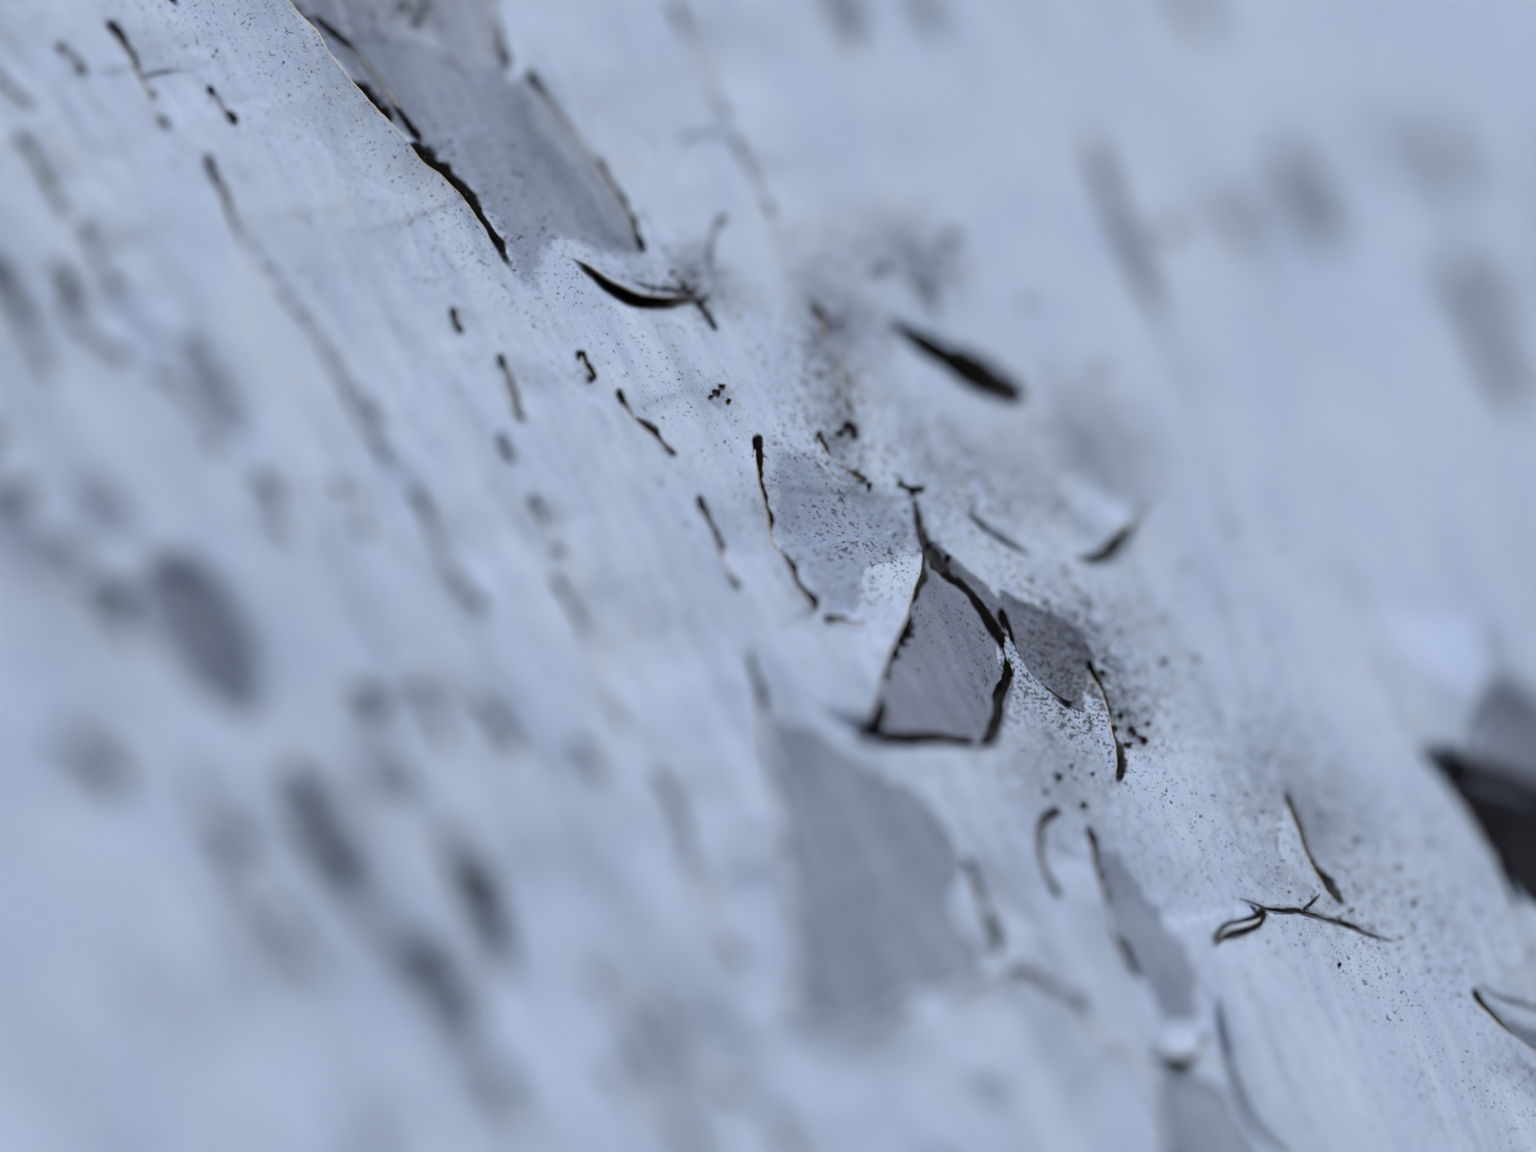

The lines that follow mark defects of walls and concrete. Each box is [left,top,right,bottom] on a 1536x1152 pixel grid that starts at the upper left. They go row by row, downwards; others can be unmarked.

peeling [47,20,169,140]
peeling [194,85,239,128]
peeling [204,0,647,304]
crack [578,209,725,331]
crack [889,317,1027,406]
crack [900,478,959,585]
crack [969,510,1030,554]
peeling [680,431,1196,1152]
peeling [1349,607,1536,906]
crack [1239,893,1395,941]
crack [1480,986,1536,1009]